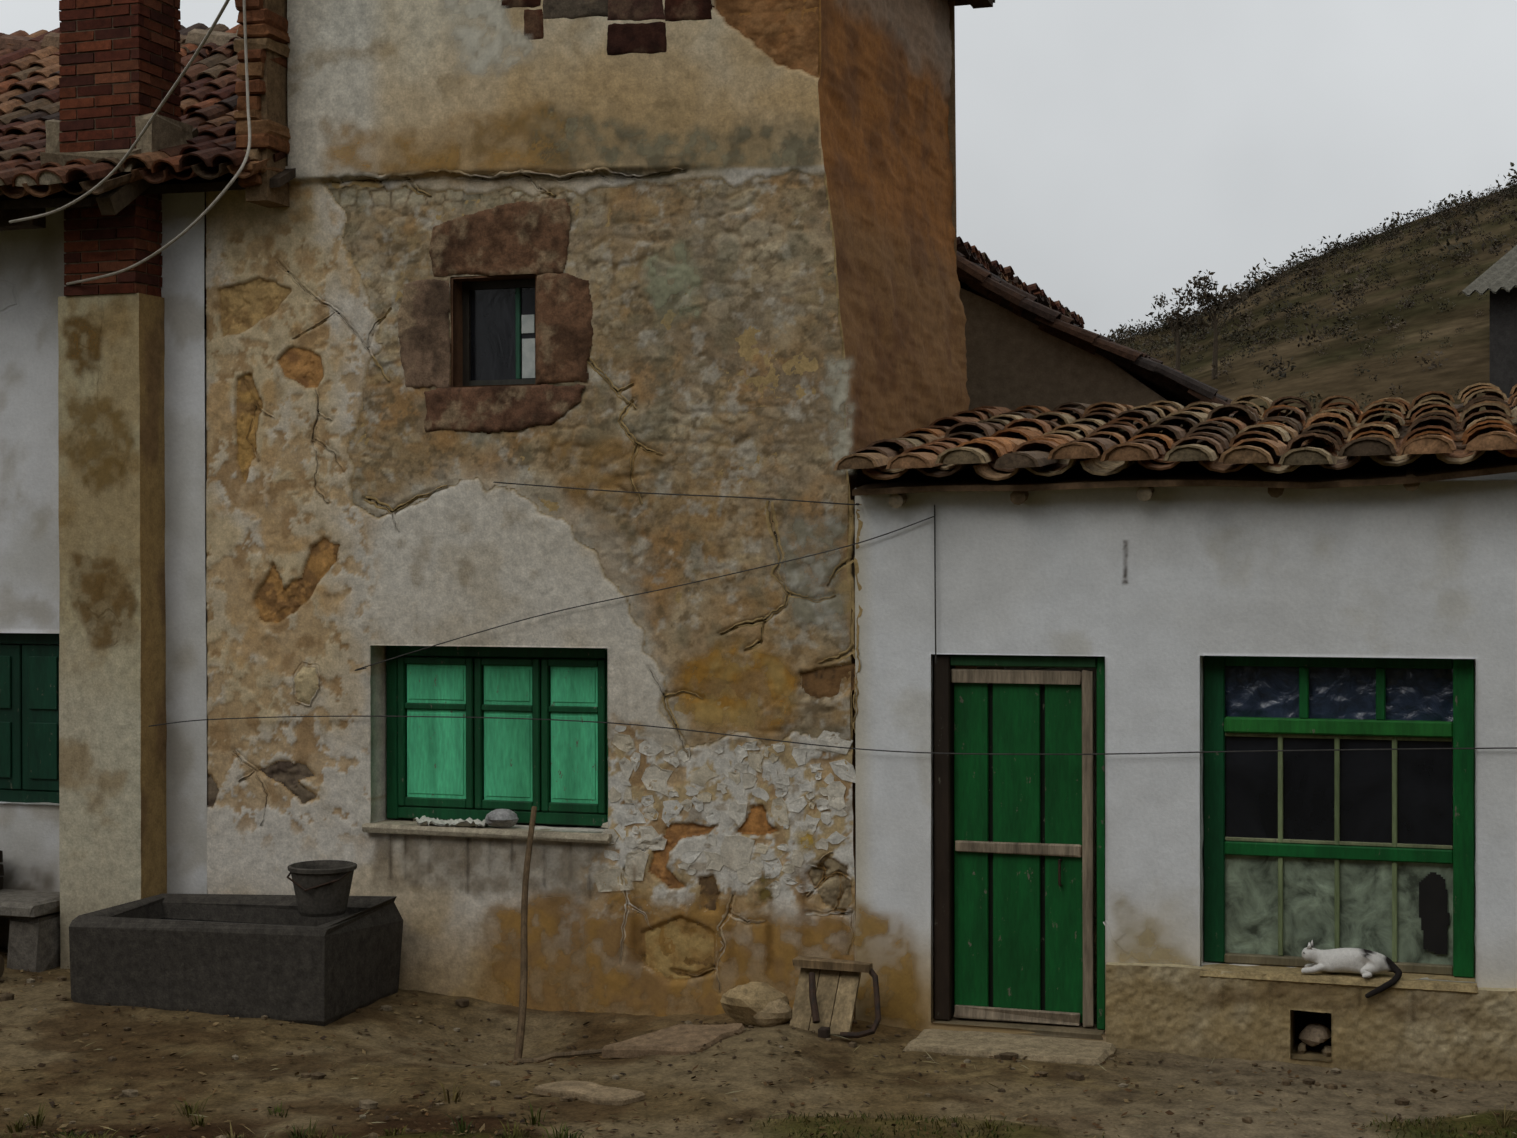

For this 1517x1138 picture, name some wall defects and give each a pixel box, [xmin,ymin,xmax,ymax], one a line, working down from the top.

leakage [395,109,567,175]
leakage [64,317,100,373]
spalling [219,279,291,336]
spalling [277,347,323,388]
leakage [68,400,133,488]
spalling [236,374,263,480]
spalling [255,538,340,623]
crack [719,499,863,730]
crack [648,667,702,757]
flaking render [593,725,856,981]